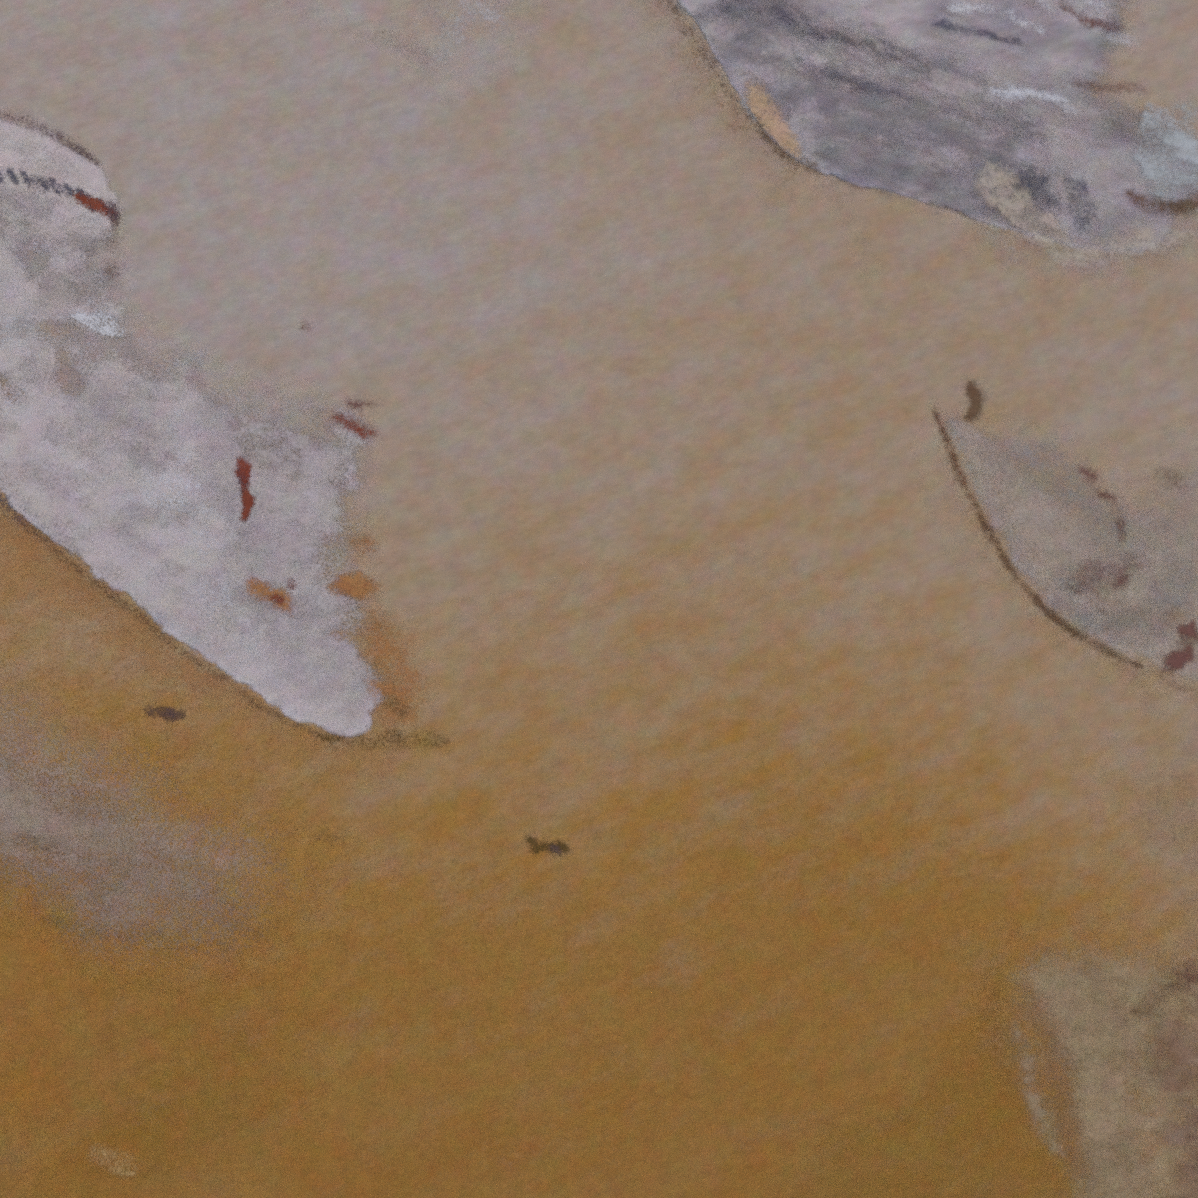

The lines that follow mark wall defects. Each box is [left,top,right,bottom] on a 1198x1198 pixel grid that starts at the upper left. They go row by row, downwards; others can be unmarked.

spalling [647,0,1198,278]
spalling [0,117,451,778]
rust [234,457,256,522]
rust [330,399,378,439]
peeling [947,380,1198,685]